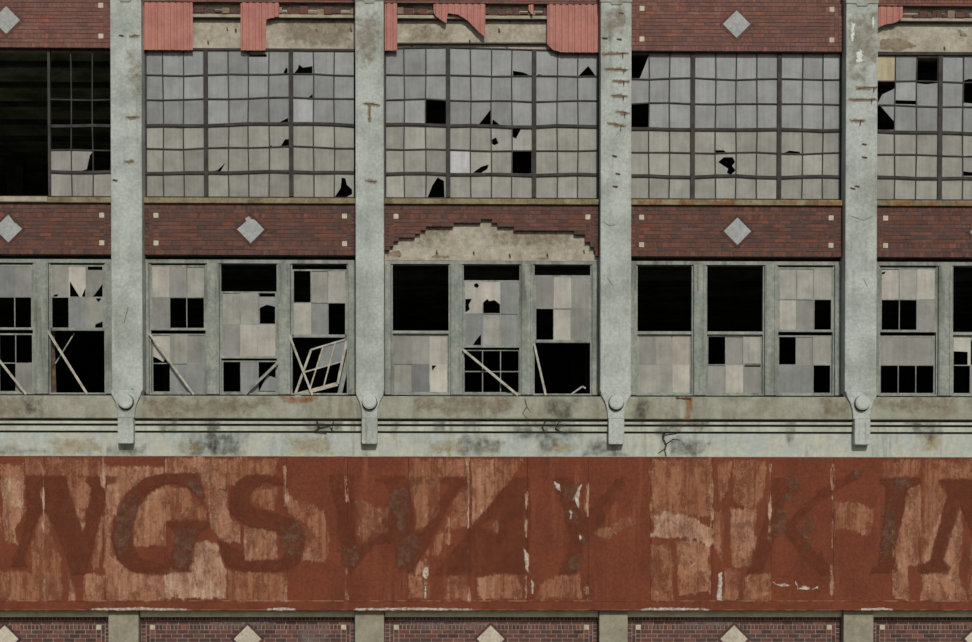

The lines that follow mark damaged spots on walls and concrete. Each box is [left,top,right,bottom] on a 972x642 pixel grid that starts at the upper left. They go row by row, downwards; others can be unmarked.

spalling [385,219,599,261]
crack [659,432,678,455]